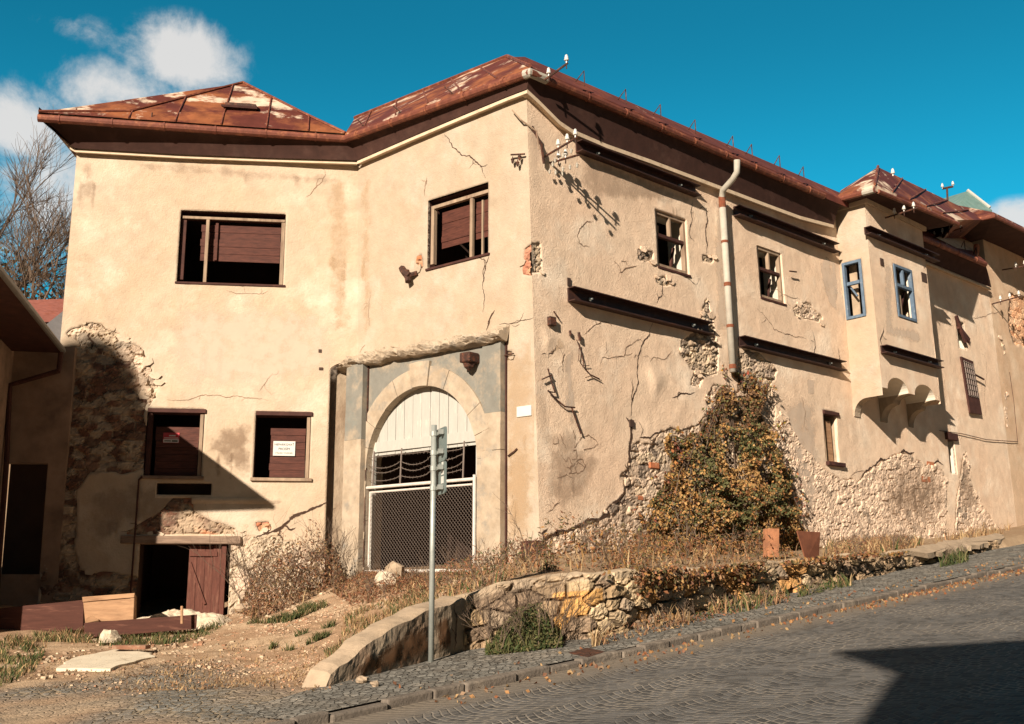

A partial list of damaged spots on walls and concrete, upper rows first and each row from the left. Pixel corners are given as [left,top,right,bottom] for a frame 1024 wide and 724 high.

crack [446,136,488,178]
spalling [518,244,545,276]
spalling [39,322,165,604]
crack [542,277,698,541]
spalling [544,299,996,555]
spalling [127,498,325,615]
crack [227,501,329,576]